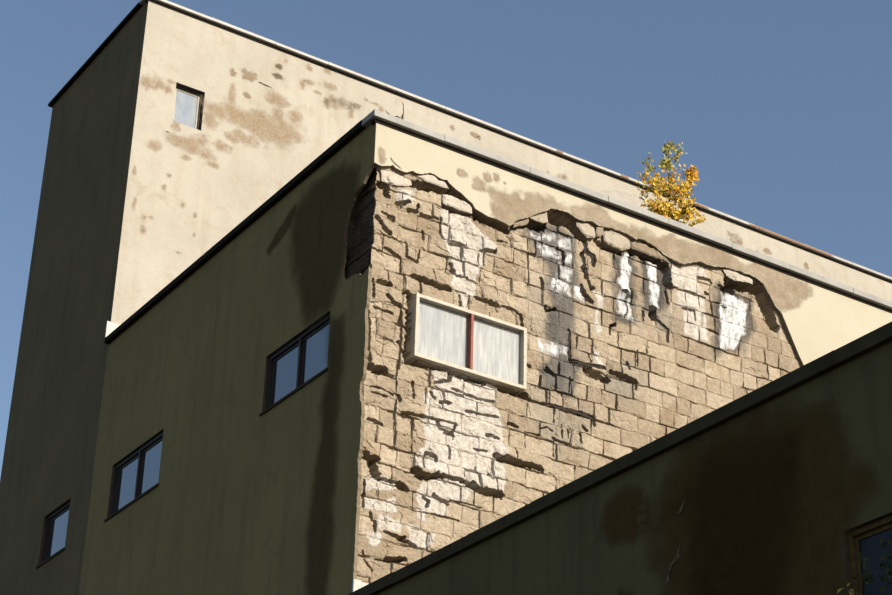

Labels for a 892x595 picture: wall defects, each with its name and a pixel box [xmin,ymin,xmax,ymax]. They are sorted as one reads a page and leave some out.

water stain [230,69,256,81]
water stain [174,87,299,167]
spalling [345,167,812,584]